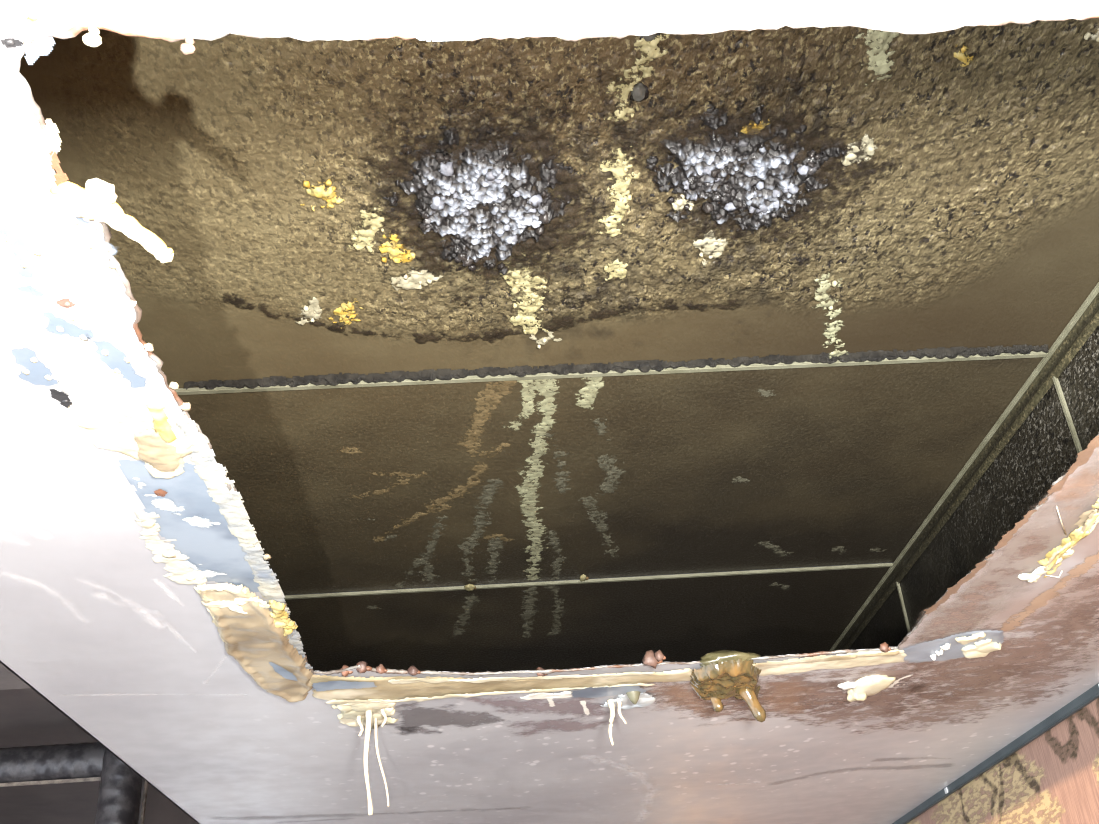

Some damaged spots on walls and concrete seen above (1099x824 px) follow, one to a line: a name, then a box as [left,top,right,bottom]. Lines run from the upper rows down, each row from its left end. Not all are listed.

peeling [68,216,117,270]
peeling [43,298,146,388]
water stain [575,377,611,441]
peeling [118,460,260,592]
water stain [352,471,428,499]
water stain [372,379,571,638]
water stain [578,455,626,557]
peeling [920,469,1099,640]
peeling [269,600,298,637]
peeling [837,681,867,702]